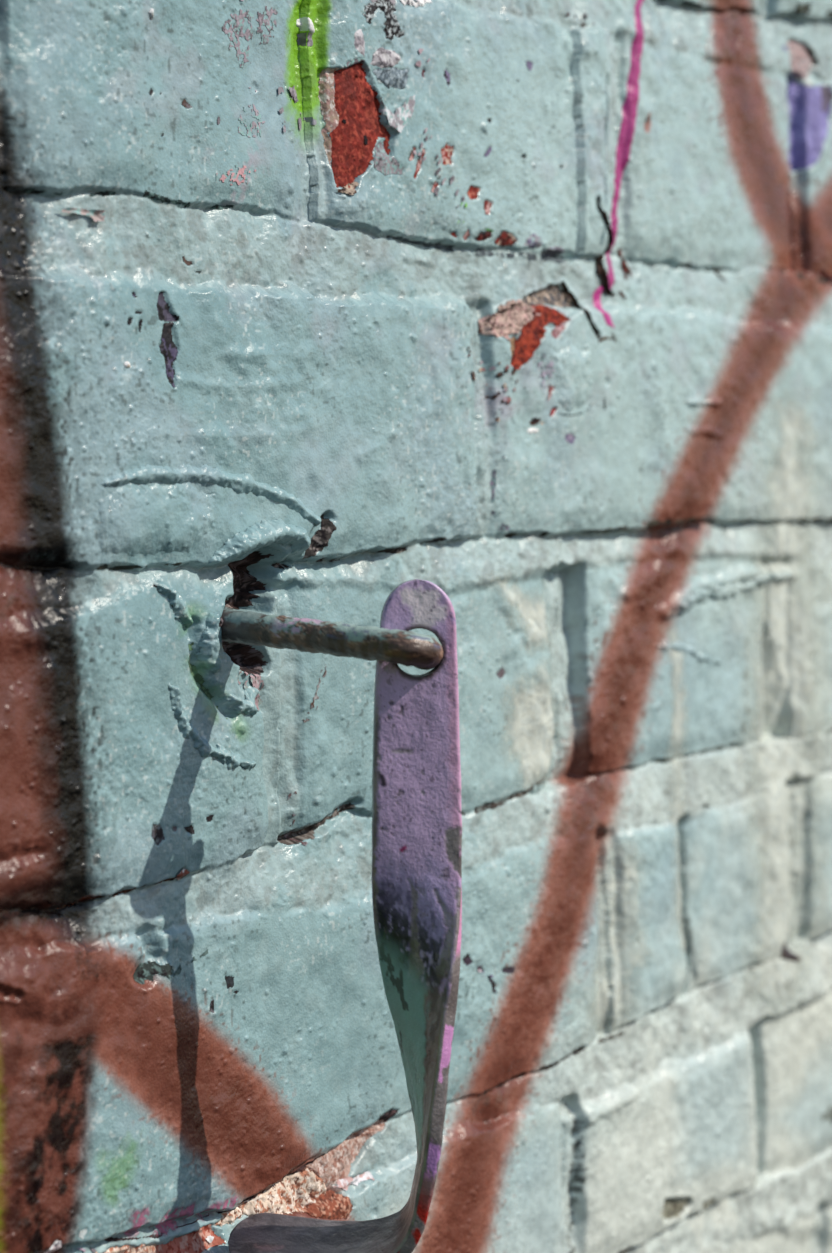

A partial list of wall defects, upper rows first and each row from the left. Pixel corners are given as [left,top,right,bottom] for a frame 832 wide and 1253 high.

peeling [222,0,278,68]
peeling [216,165,256,185]
spalling [278,0,565,257]
crack [603,73,611,145]
crack [387,177,633,343]
spalling [468,284,574,434]
peeling [45,1109,398,1253]